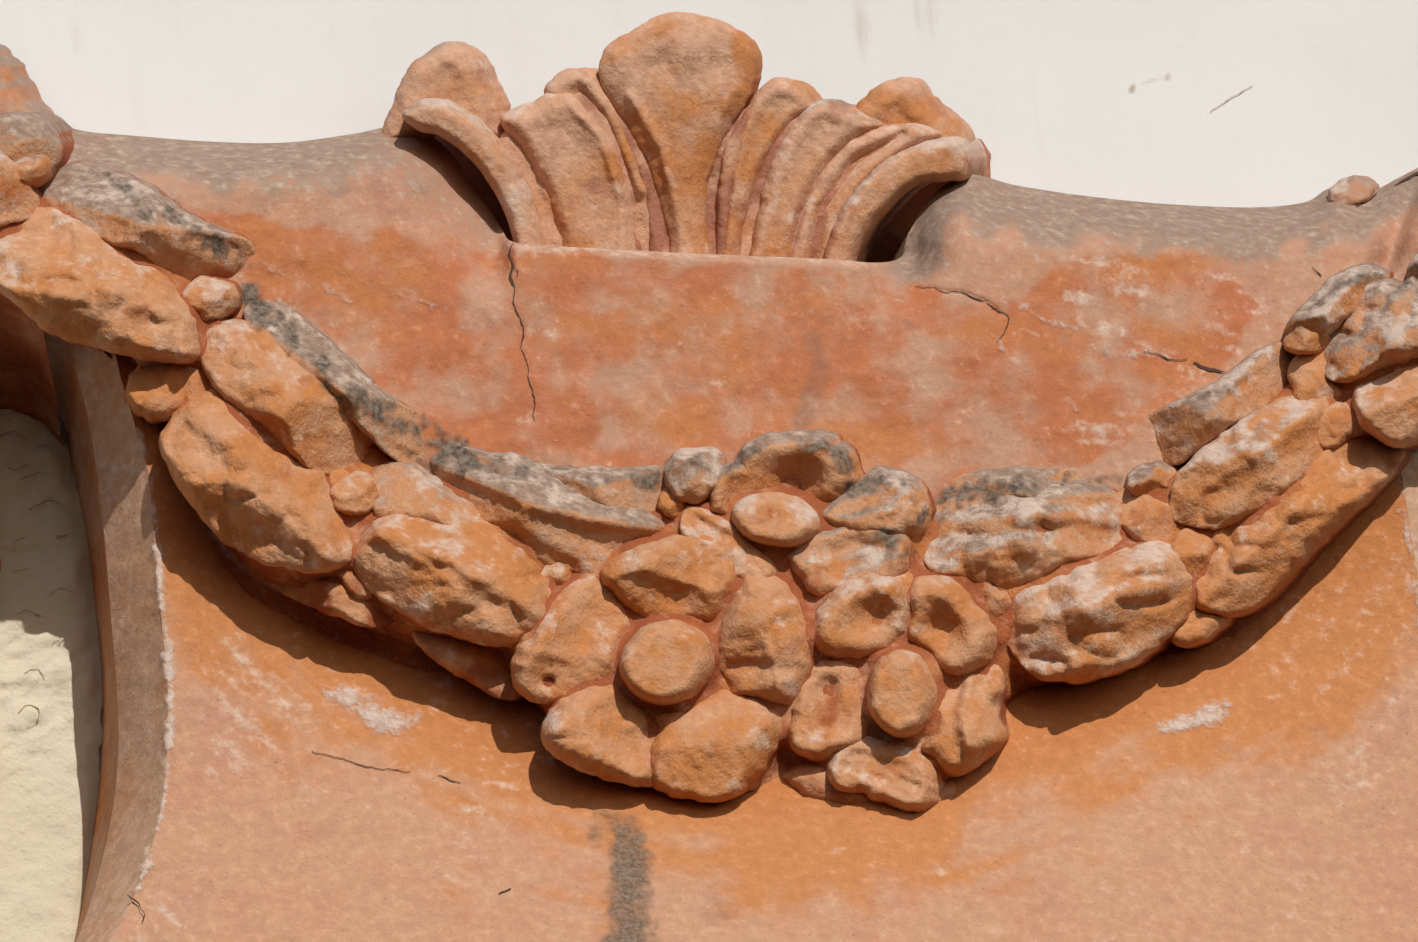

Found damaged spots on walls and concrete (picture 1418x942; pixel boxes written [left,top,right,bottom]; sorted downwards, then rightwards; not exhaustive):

crack [508,244,536,421]
crack [916,286,1010,342]
crack [1144,351,1225,372]
water stain [604,824,649,942]